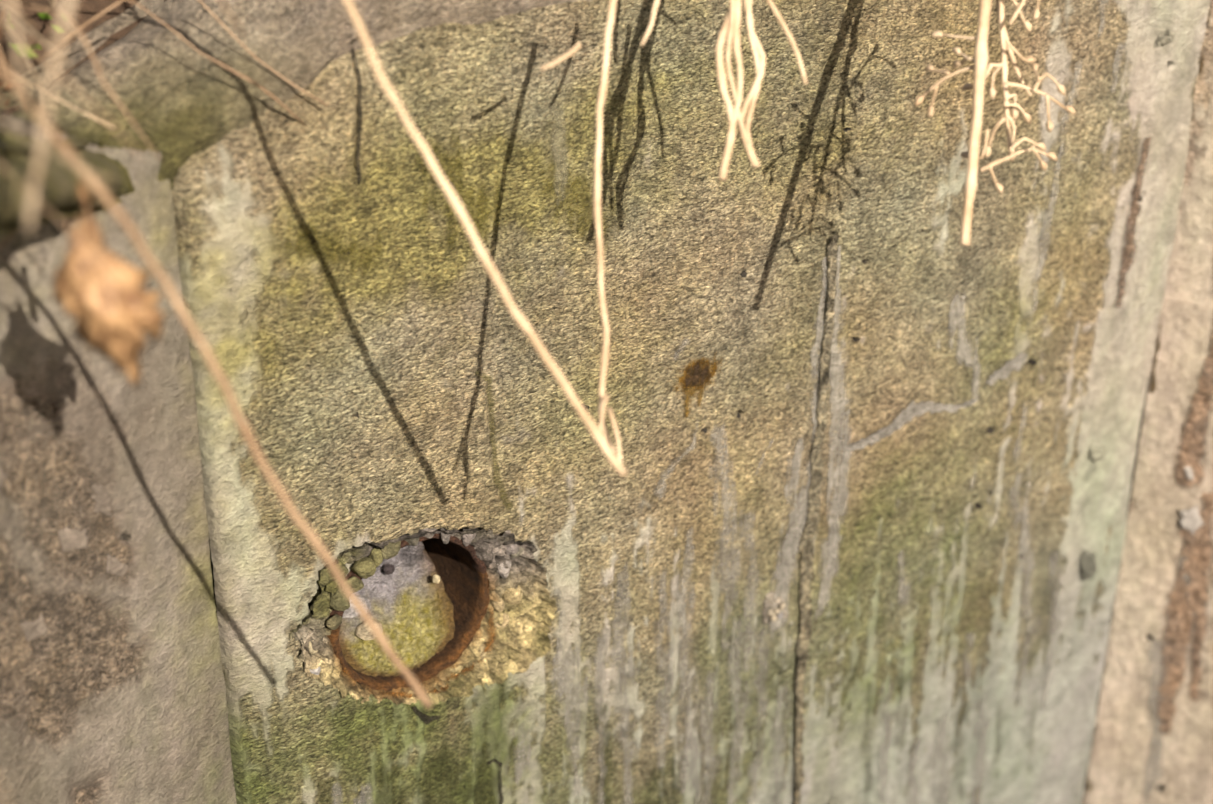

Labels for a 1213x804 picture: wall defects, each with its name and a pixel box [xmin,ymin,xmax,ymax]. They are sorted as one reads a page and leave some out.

rust [676,356,721,418]
damp [770,246,851,631]
rust [327,533,495,698]
spalling [289,527,557,705]